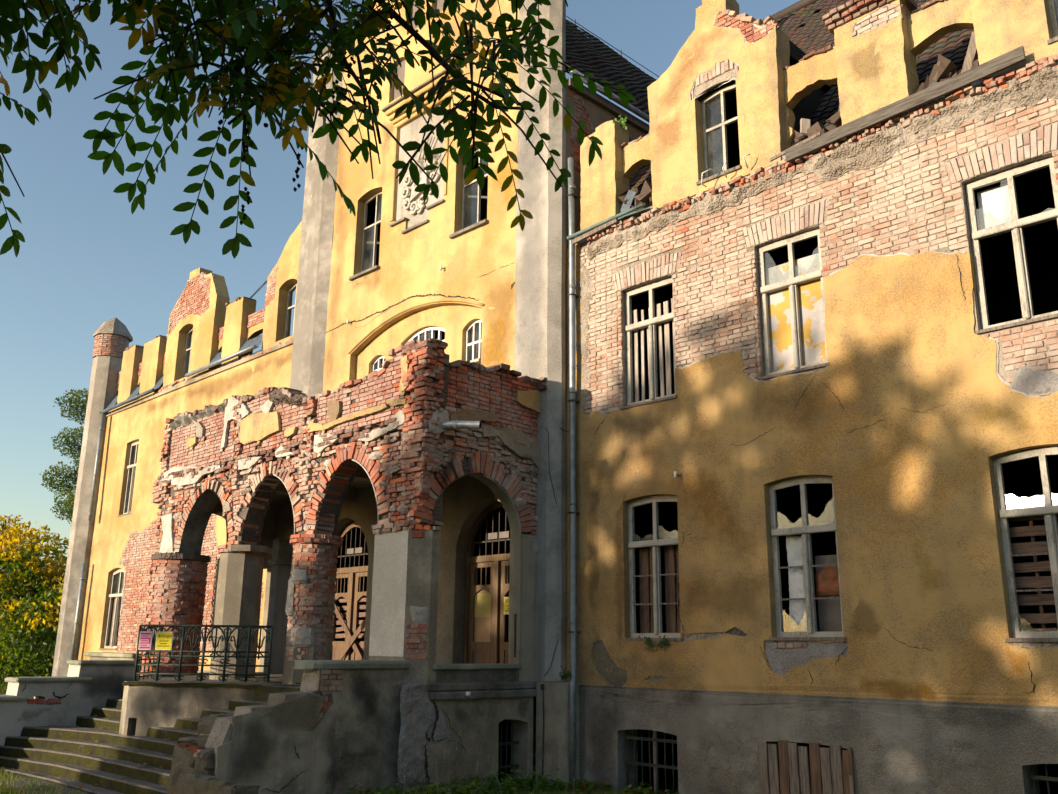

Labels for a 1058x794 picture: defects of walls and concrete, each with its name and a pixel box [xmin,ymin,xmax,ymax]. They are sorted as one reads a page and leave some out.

flaking render [569,88,596,174]
flaking render [575,97,1058,415]
flaking render [160,355,409,487]
flaking render [427,409,499,435]
flaking render [117,513,176,653]
flaking render [200,498,233,655]
flaking render [593,640,627,687]
flaking render [765,640,848,676]
crack [425,701,465,783]